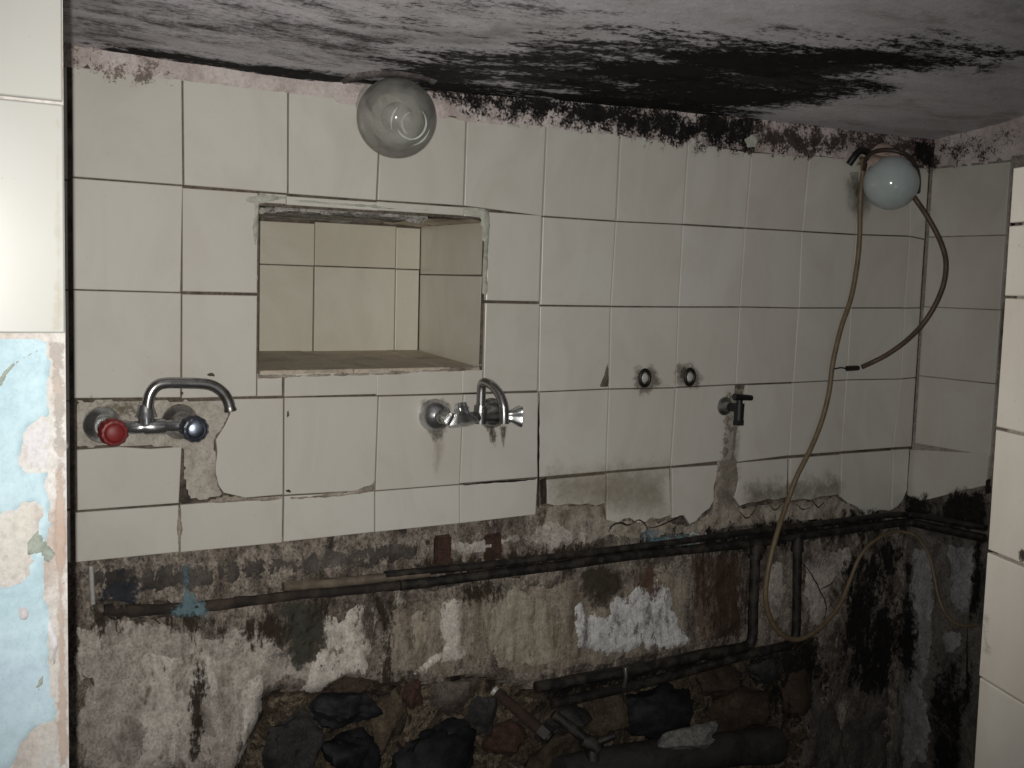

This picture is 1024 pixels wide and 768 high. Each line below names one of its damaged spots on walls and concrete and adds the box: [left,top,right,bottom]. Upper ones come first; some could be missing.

damp [66,0,1024,173]
peeling [0,339,59,768]
spalling [77,392,228,500]
damp [166,600,227,763]
damp [375,594,394,689]
spalling [451,415,861,554]
damp [700,489,987,739]
damp [928,656,973,768]